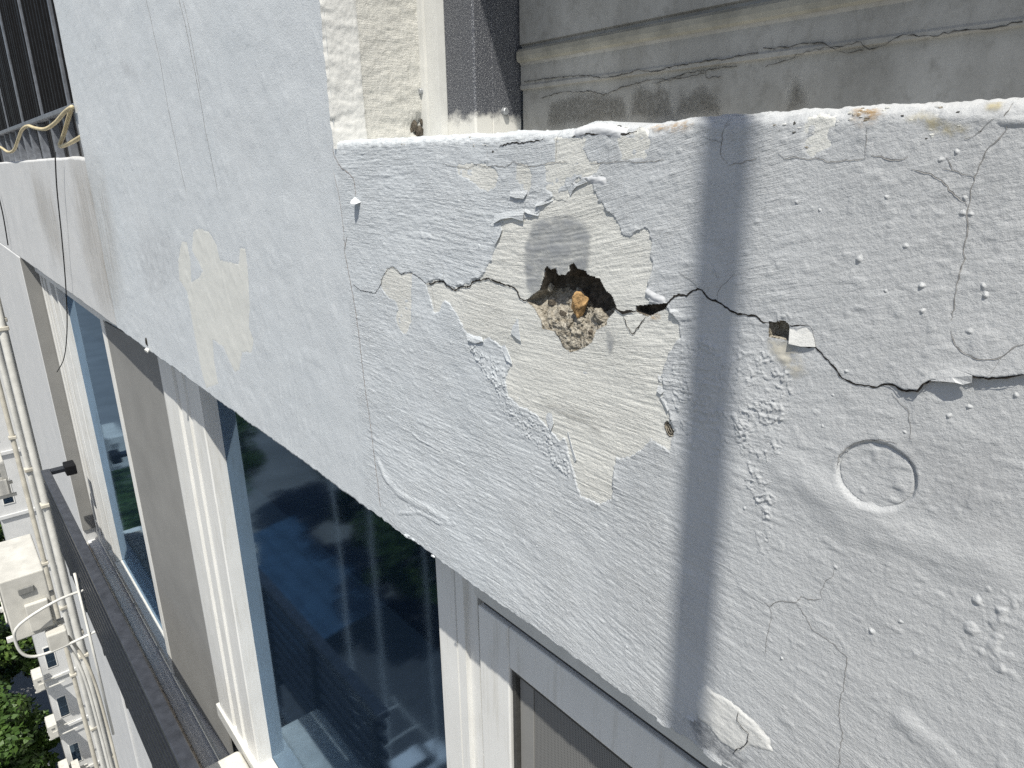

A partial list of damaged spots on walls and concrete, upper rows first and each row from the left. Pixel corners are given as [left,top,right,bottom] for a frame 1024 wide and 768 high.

crack [449,131,665,180]
peeling [178,228,253,388]
crack [333,152,529,502]
peeling [426,135,681,504]
crack [614,307,645,335]
crack [666,99,1023,463]
peeling [686,685,773,765]
crack [765,569,847,765]